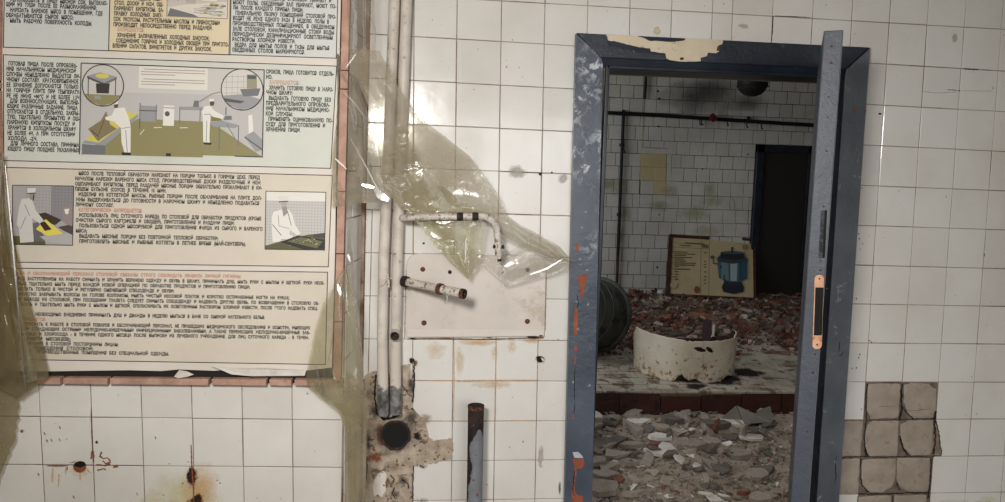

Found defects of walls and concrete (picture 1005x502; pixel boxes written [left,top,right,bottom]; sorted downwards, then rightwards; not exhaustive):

peeling [606,35,723,62]
peeling [572,270,589,420]
corrosion [48,410,118,485]
corrosion [182,445,203,502]
spalling [360,357,454,502]
peeling [572,452,584,502]
spalling [839,382,942,502]